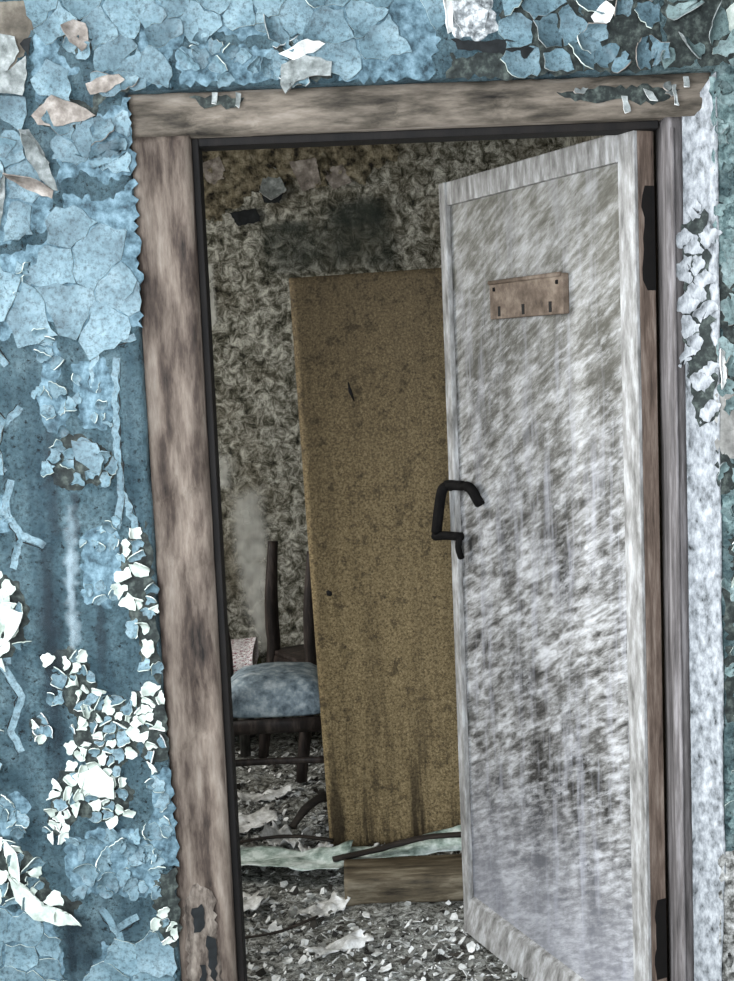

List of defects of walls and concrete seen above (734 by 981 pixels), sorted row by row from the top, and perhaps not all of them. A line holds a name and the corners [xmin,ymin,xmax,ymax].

peeling [0,0,734,491]
peeling [0,495,15,533]
peeling [676,198,734,723]
peeling [0,516,218,981]
peeling [725,765,734,834]
crack [98,906,139,950]
flaking render [718,850,734,981]